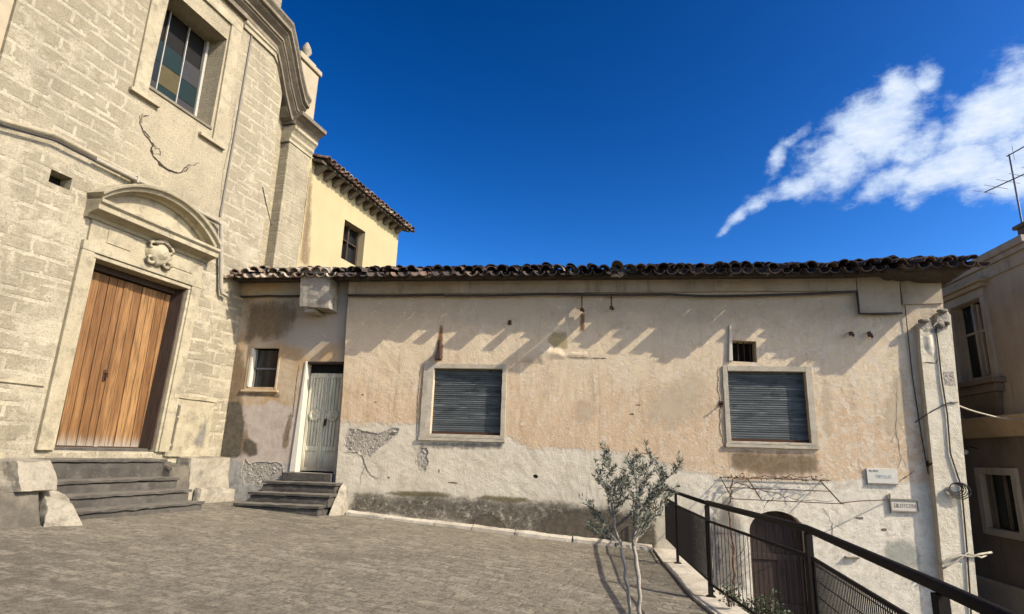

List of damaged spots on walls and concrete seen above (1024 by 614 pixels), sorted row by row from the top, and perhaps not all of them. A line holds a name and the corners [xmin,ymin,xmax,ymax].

crack [139,113,197,174]
spalling [343,427,400,458]
spalling [240,458,284,487]
spalling [415,446,440,473]
damp [352,491,655,548]